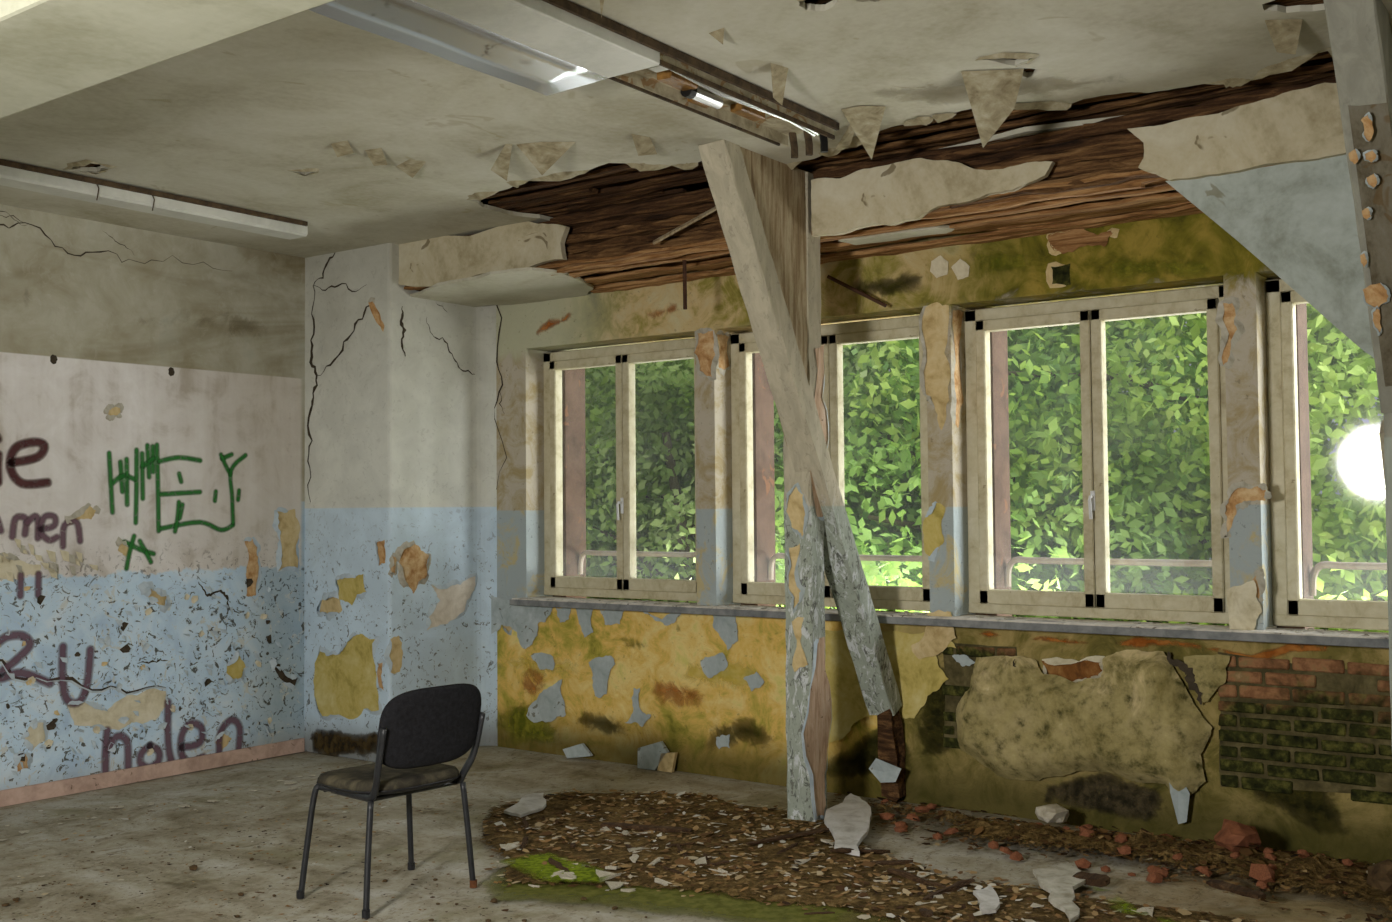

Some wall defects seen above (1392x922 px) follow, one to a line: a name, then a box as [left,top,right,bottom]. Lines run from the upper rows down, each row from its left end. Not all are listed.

peeling [467,142,589,201]
peeling [626,134,698,171]
peeling [819,106,885,160]
crack [0,211,227,271]
crack [307,253,507,502]
peeling [64,503,101,525]
peeling [375,539,478,630]
peeling [0,507,403,776]
flaking render [942,643,1017,749]
flaking render [1041,656,1105,682]
flaking render [1218,652,1392,805]
flaking render [1045,774,1190,824]